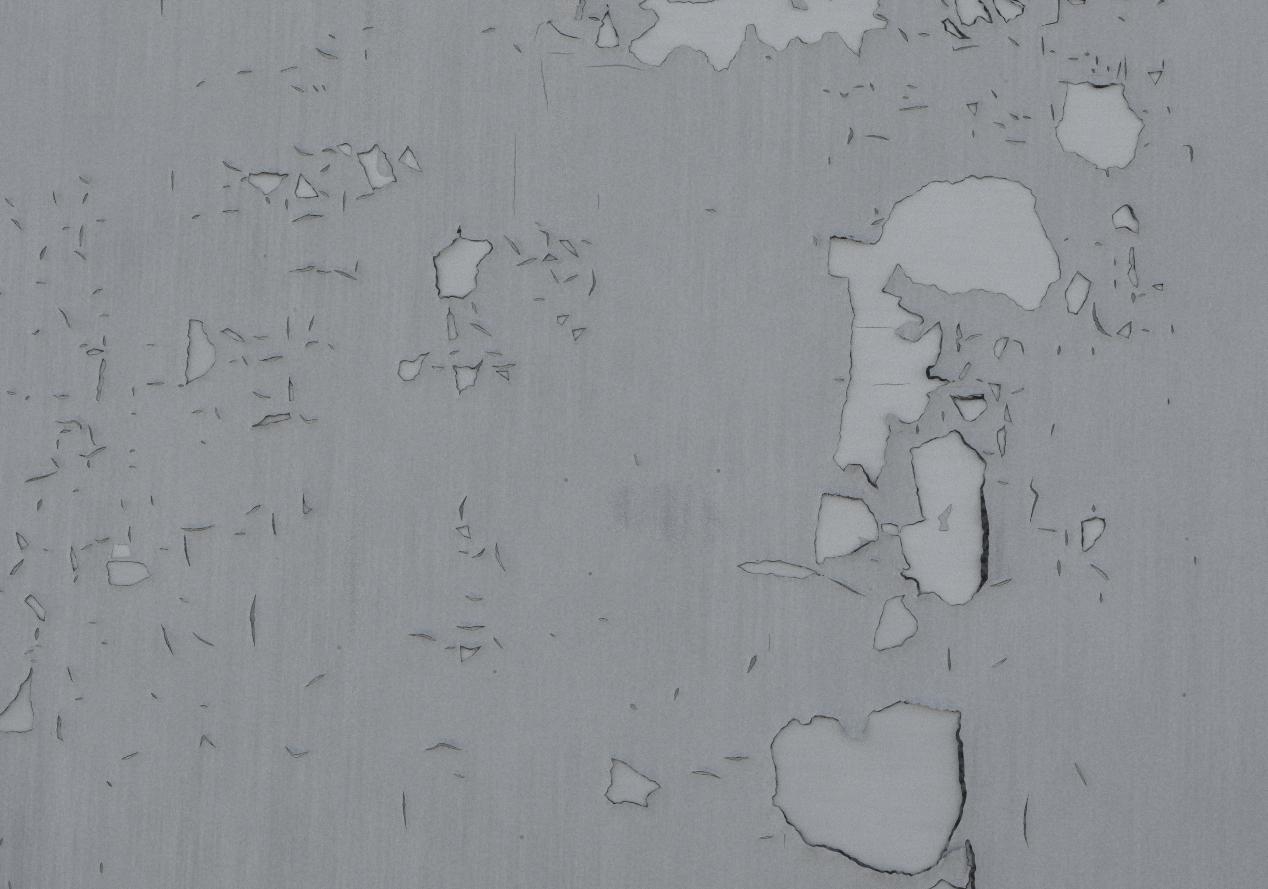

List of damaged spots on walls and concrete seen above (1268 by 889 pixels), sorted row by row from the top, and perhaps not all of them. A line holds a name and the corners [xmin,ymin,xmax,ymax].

peeling [550,0,897,81]
peeling [911,0,1065,52]
peeling [1045,48,1154,187]
peeling [186,137,428,227]
peeling [1089,199,1169,297]
peeling [390,213,597,404]
peeling [141,310,325,434]
peeling [804,165,1137,666]
peeling [402,590,508,668]
peeling [0,660,88,747]
peeling [594,748,671,817]
peeling [685,678,1022,889]